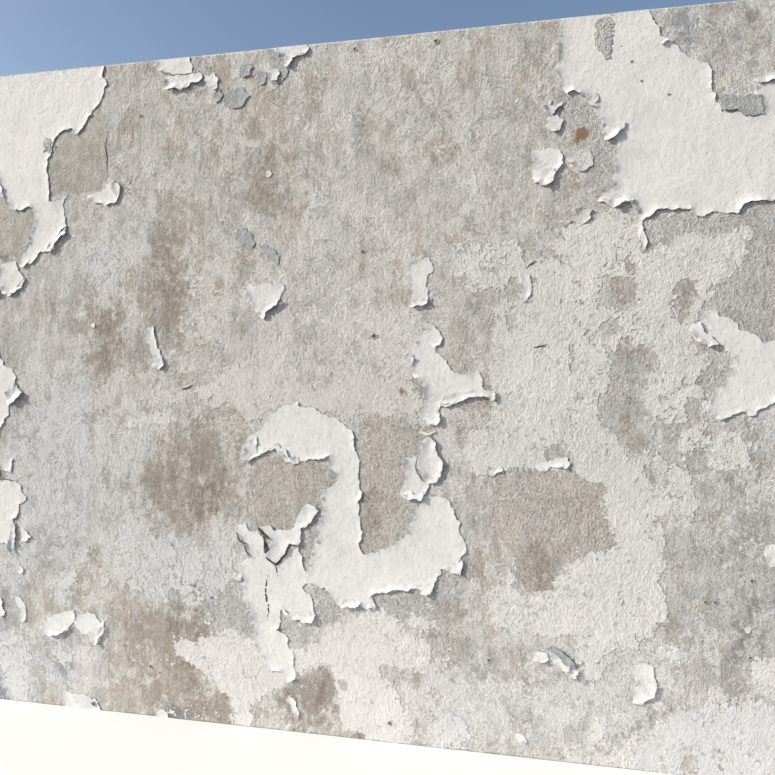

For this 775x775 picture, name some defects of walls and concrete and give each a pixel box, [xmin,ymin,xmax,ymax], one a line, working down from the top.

peeling [0,66,121,296]
peeling [0,358,23,427]
peeling [124,9,775,747]
peeling [0,458,31,553]
crack [236,526,298,619]
peeling [40,610,104,668]
peeling [616,697,775,775]